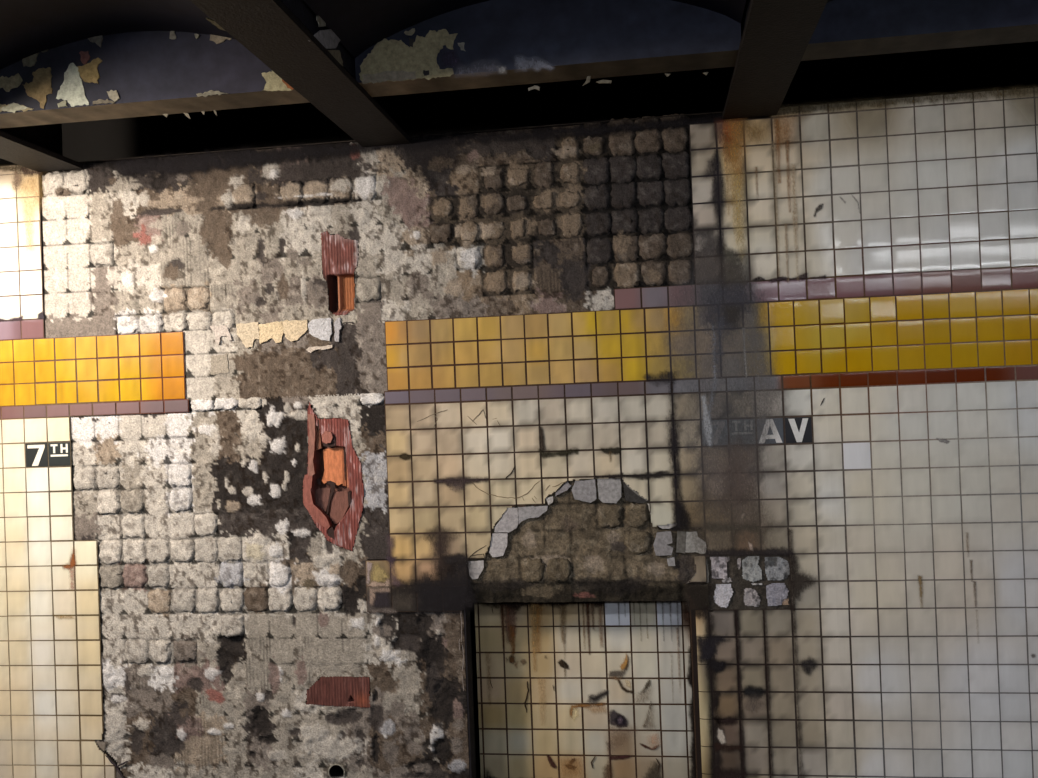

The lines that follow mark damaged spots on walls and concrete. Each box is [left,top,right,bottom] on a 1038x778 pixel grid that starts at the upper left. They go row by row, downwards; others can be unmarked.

peeling [0,35,120,113]
peeling [194,17,231,44]
peeling [262,71,294,92]
peeling [308,16,343,66]
peeling [359,28,465,84]
water stain [702,328,716,445]
spalling [42,113,695,778]
spalling [467,478,791,611]
corrosion [500,603,516,655]
corrosion [582,603,603,654]
water stain [743,685,766,710]